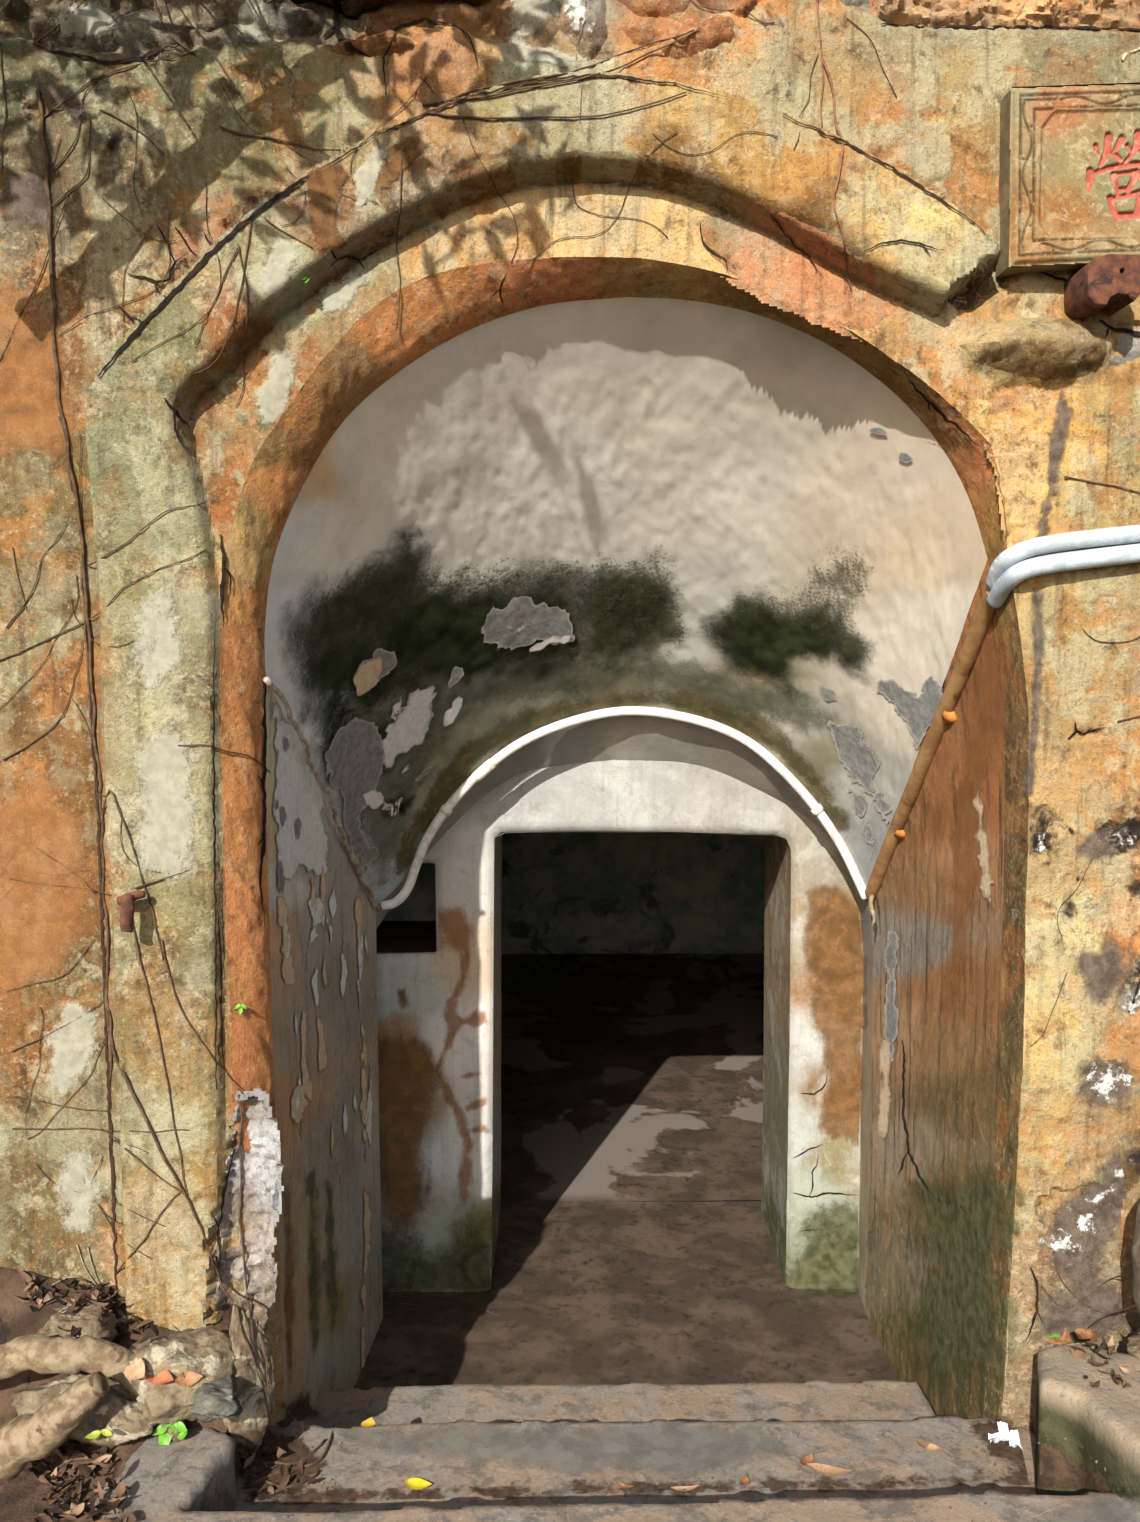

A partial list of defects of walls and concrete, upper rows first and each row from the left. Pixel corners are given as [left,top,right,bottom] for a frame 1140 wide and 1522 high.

spalling [0,0,761,62]
spalling [839,0,1140,31]
crack [881,23,1140,31]
peeling [330,648,397,705]
peeling [481,596,575,652]
damp [287,531,876,884]
corrosion [944,636,1006,1008]
spalling [208,666,464,1334]
corrosion [378,909,486,1227]
corrosion [804,886,900,1144]
spalling [1117,957,1140,1012]
peeling [360,1188,371,1368]